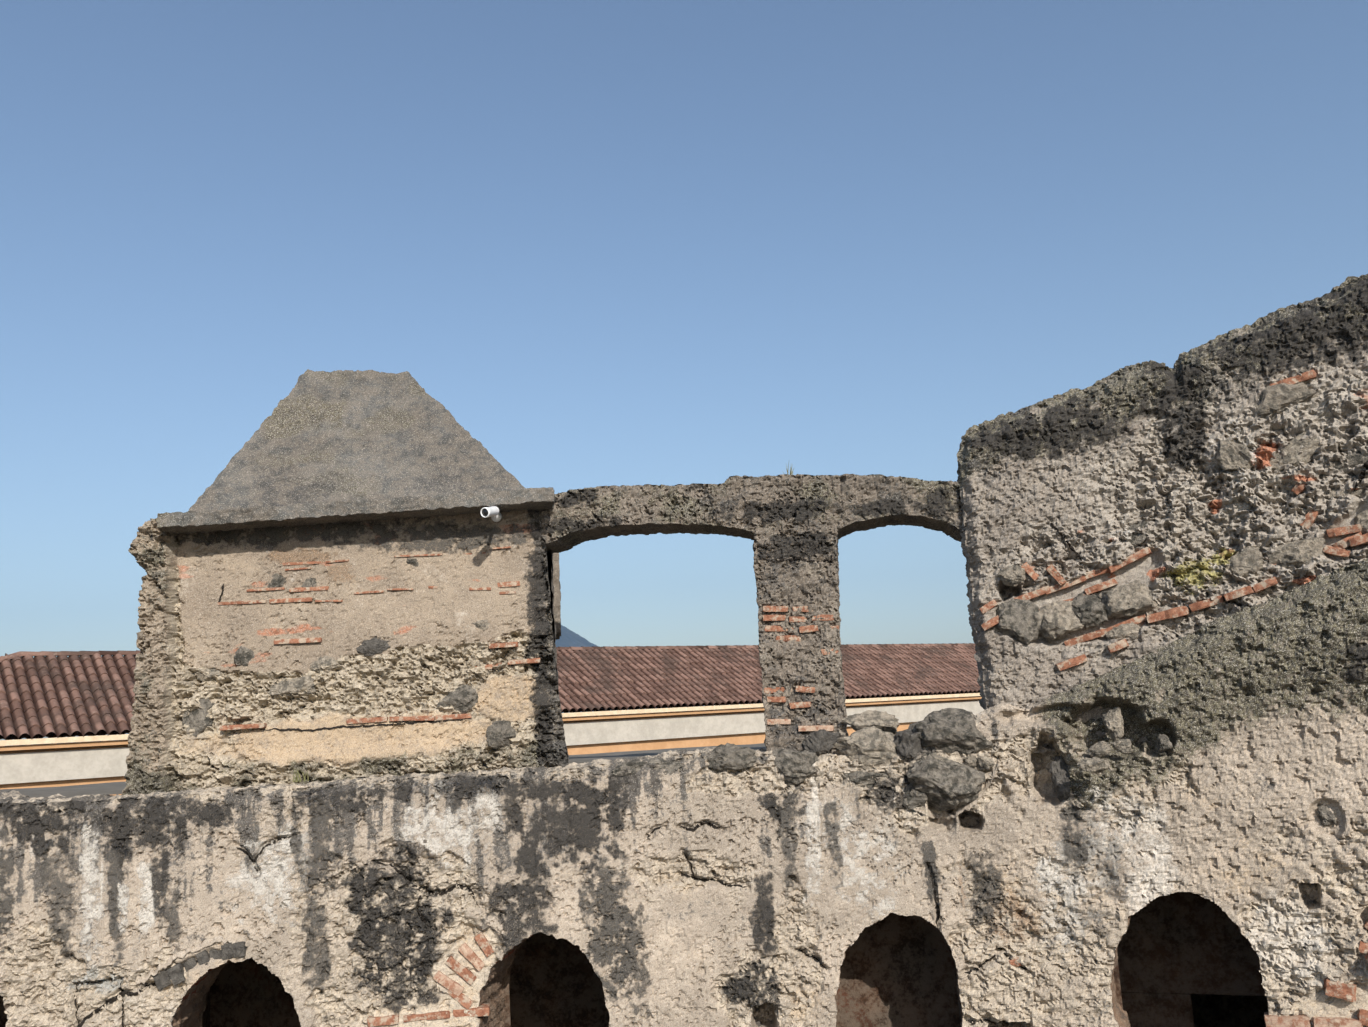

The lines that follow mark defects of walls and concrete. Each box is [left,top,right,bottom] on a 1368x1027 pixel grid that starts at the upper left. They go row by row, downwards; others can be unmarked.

spalling [164,515,565,765]
damp [150,488,622,763]
spalling [367,927,506,1027]
damp [226,766,652,1025]
crack [648,821,748,888]
spalling [1264,979,1368,1027]
spalling [1359,904,1368,962]